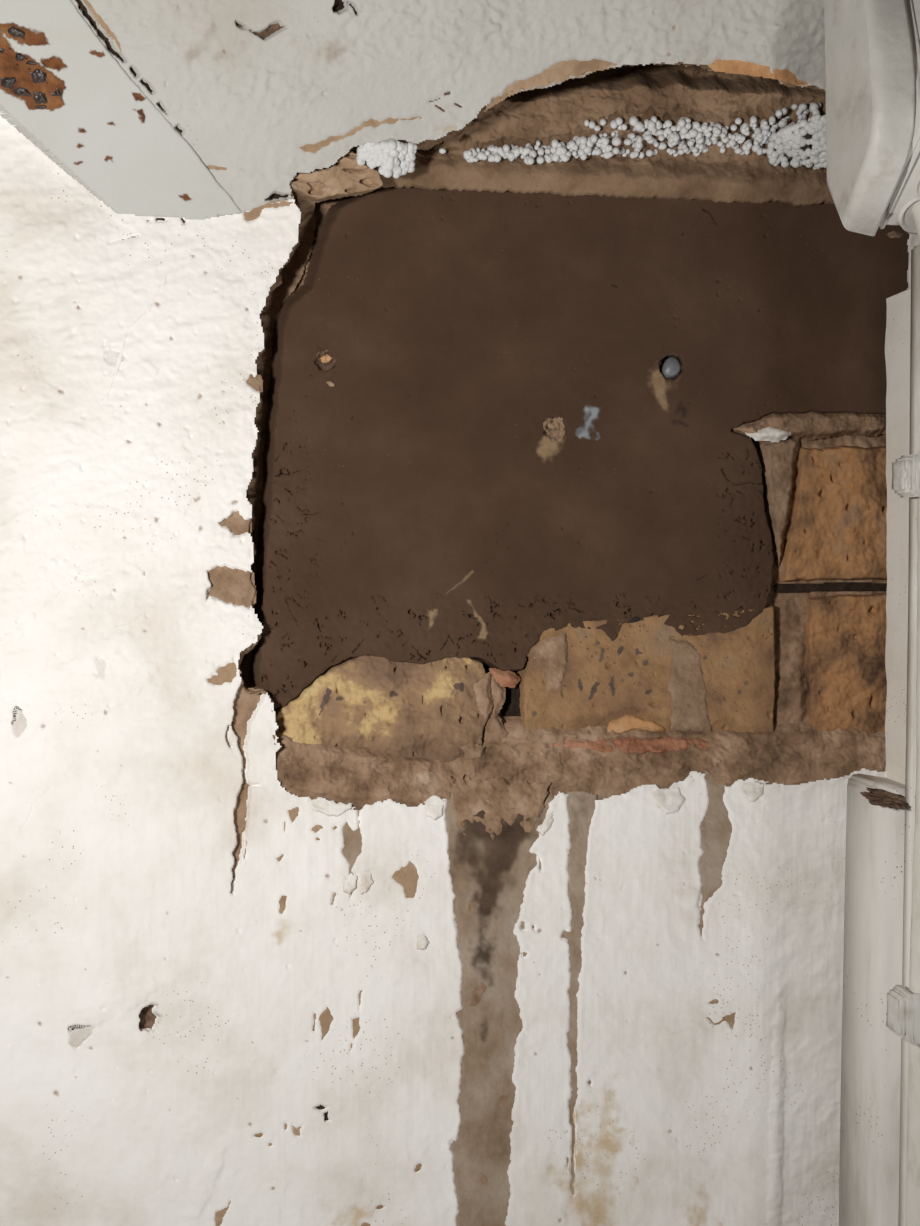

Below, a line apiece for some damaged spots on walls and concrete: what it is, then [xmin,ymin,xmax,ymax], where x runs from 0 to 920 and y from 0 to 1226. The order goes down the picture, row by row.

rust [0,23,67,111]
rust [132,93,145,123]
spalling [484,59,825,112]
peeling [300,116,422,154]
spalling [398,126,466,151]
spalling [208,190,316,614]
flaking render [207,411,887,763]
spalling [284,797,373,905]
spalling [392,861,419,898]
damp [457,810,530,915]
damp [474,947,491,974]
spalling [312,1007,334,1040]